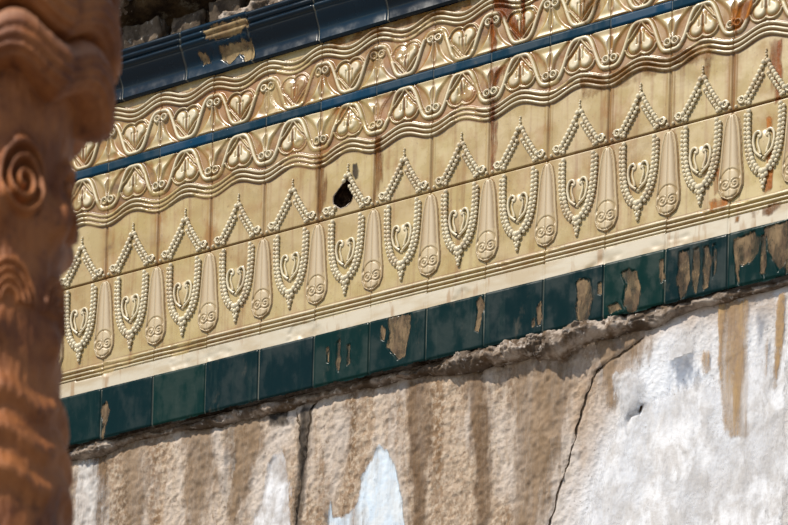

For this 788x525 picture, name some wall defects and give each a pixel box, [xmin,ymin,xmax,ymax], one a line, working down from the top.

spalling [203,17,255,64]
corrosion [491,65,506,86]
corrosion [490,98,498,170]
spalling [334,163,358,208]
spalling [576,279,602,321]
spalling [611,271,641,314]
spalling [677,248,716,298]
spalling [734,221,788,281]
spalling [381,314,411,359]
crack [296,403,317,461]
crack [548,338,642,525]
peeling [584,340,788,525]